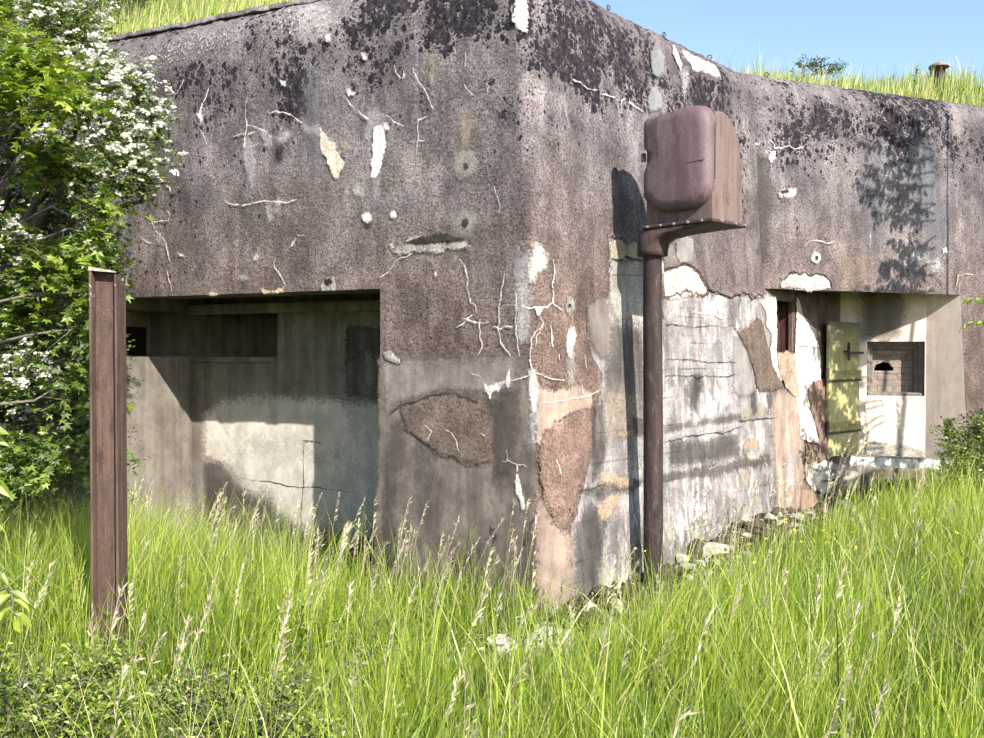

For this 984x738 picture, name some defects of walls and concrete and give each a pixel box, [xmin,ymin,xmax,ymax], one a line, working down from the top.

leakage [130,29,237,70]
leakage [273,4,336,42]
spalling [510,0,528,33]
crack [196,88,209,143]
crack [226,96,303,222]
spalling [320,128,348,179]
spalling [366,110,389,200]
crack [459,260,564,399]
peeling [229,232,643,624]
peeling [662,260,847,565]
crack [502,450,525,510]